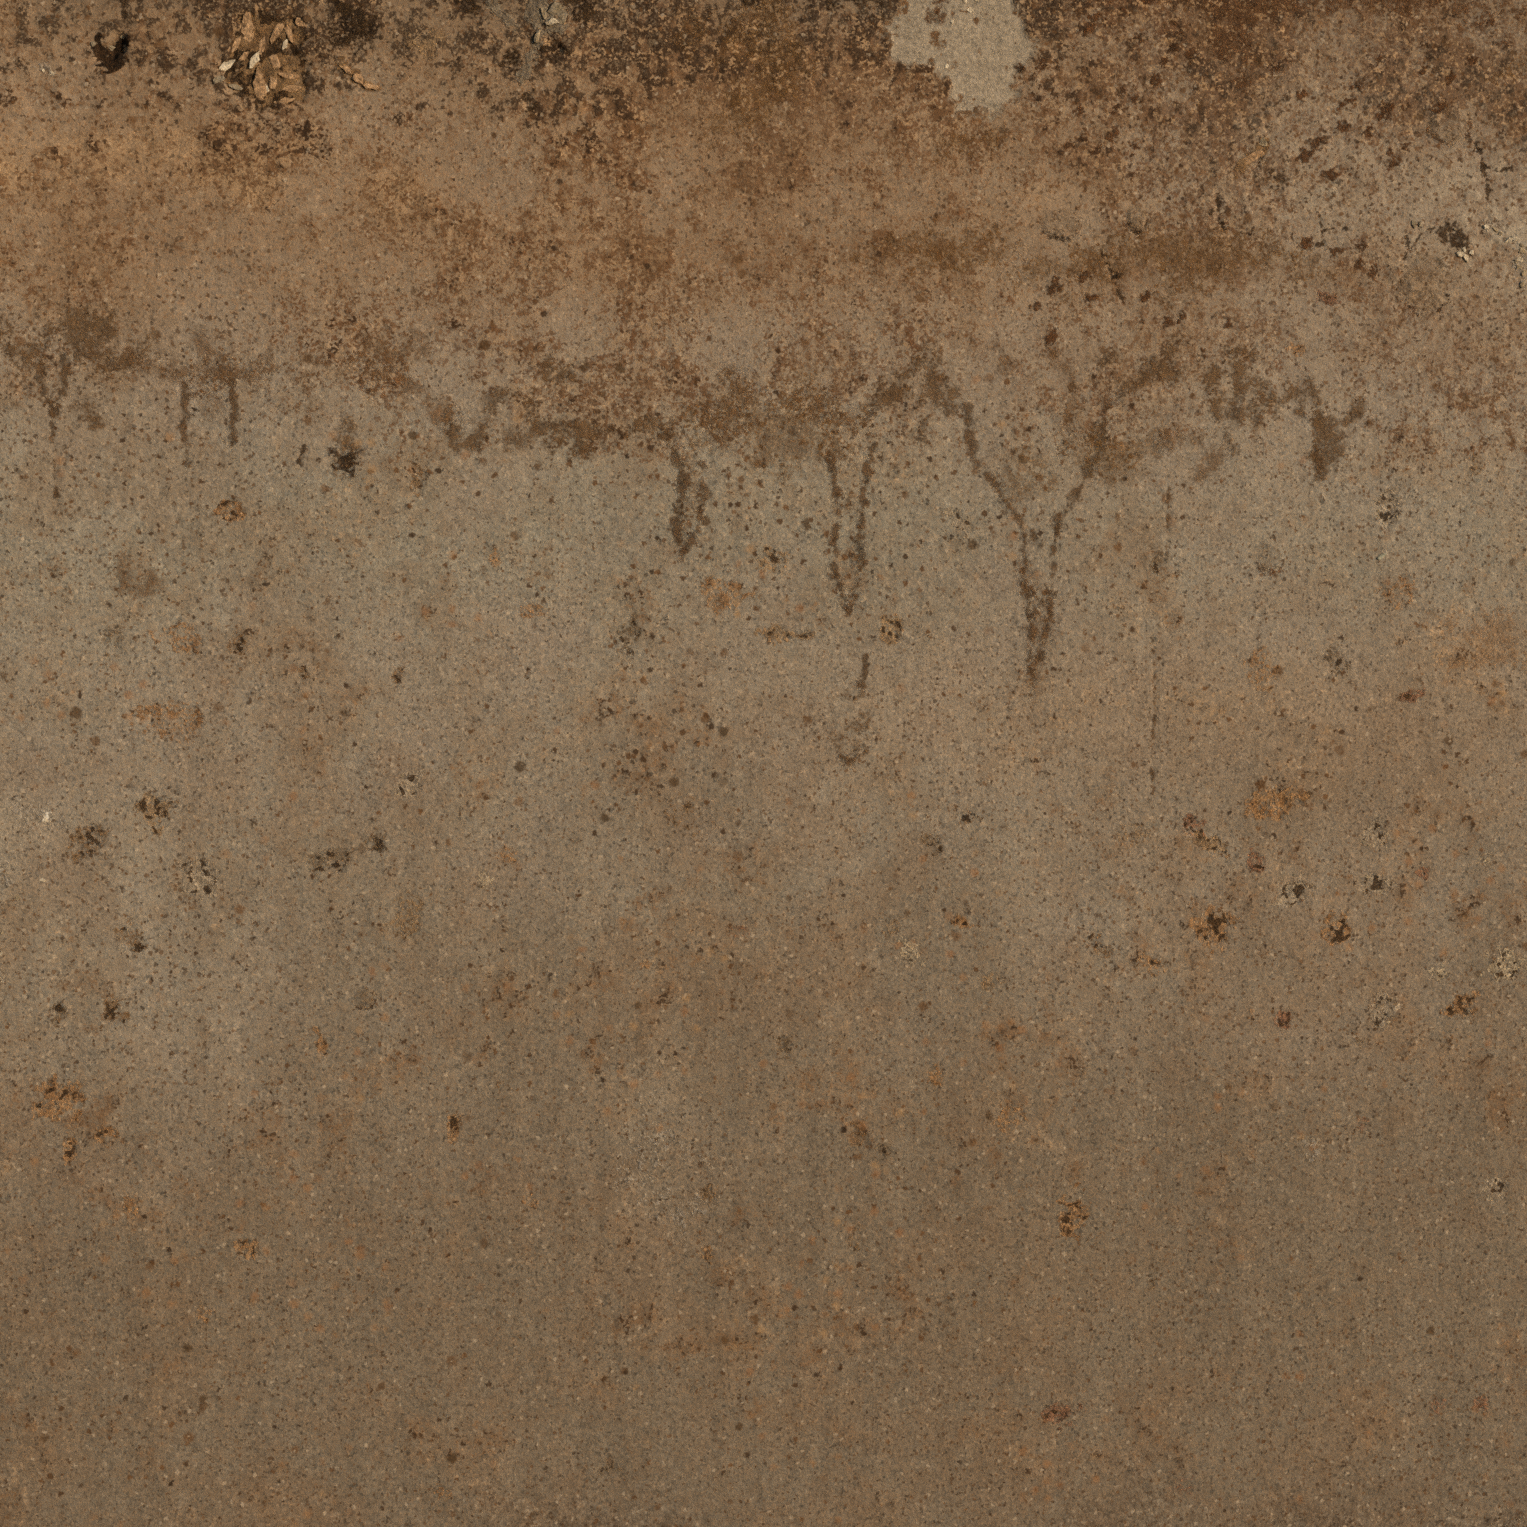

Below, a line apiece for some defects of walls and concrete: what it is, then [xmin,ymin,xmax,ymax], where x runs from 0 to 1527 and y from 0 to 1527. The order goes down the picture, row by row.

water stain [326,0,382,54]
water stain [498,38,571,72]
water stain [564,0,600,25]
peeling [878,0,1127,121]
spalling [1150,31,1197,86]
spalling [1064,86,1142,155]
water stain [0,304,159,431]
water stain [228,378,239,446]
water stain [329,413,363,480]
water stain [445,354,711,556]
water stain [1204,347,1364,481]
water stain [826,336,1185,697]